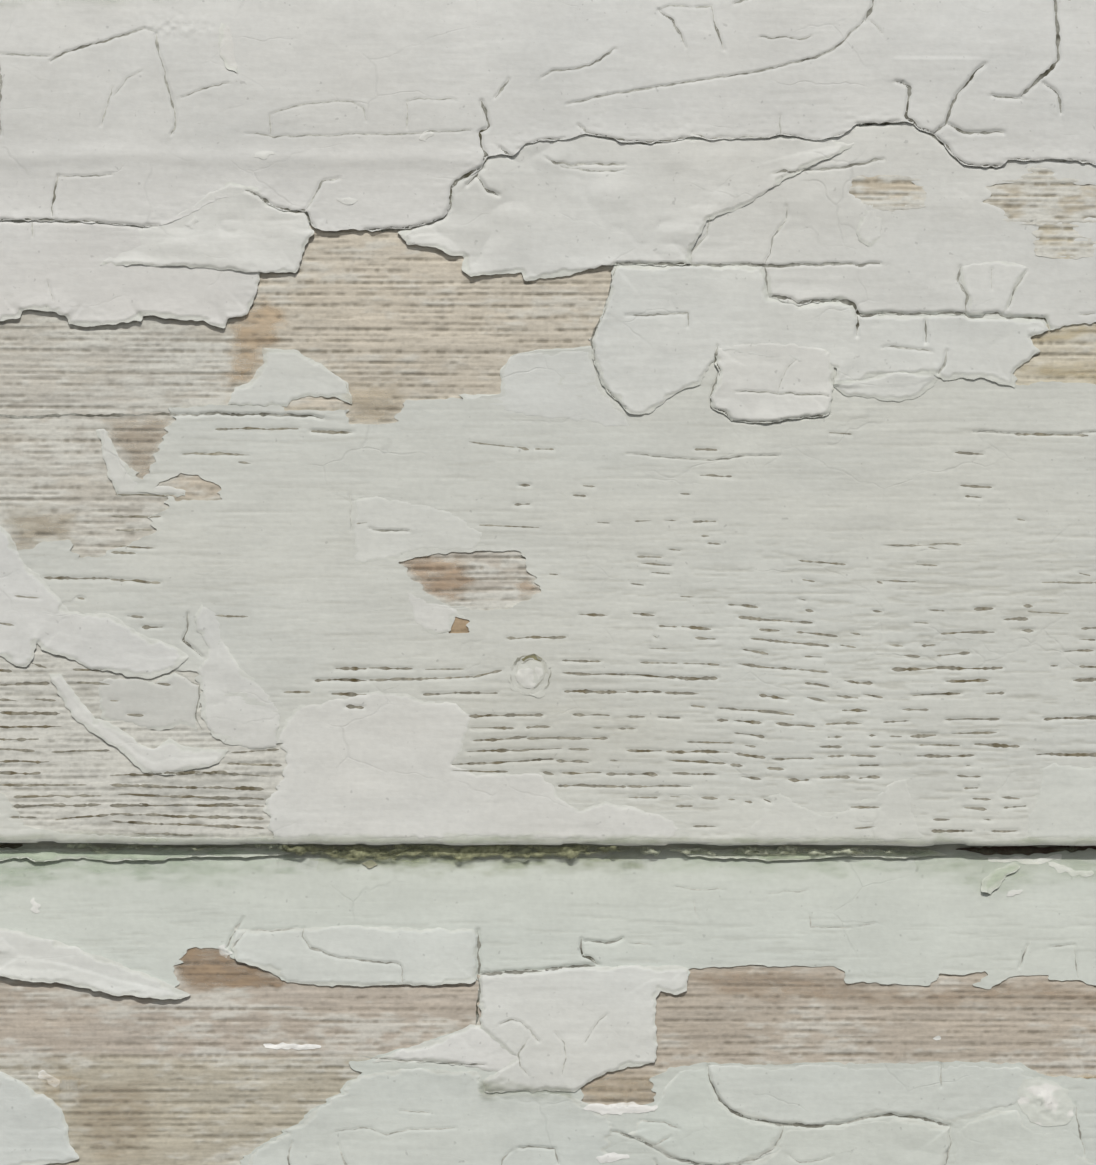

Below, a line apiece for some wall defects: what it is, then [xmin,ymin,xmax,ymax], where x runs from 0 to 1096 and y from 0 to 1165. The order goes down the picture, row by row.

crack [0,29,223,135]
crack [246,0,1095,232]
crack [590,211,1049,409]
peeling [0,122,1096,862]
crack [360,1055,485,1065]
peeling [0,925,1096,1165]
crack [335,1110,449,1165]
crack [612,1069,951,1165]
crack [1075,1107,1085,1155]